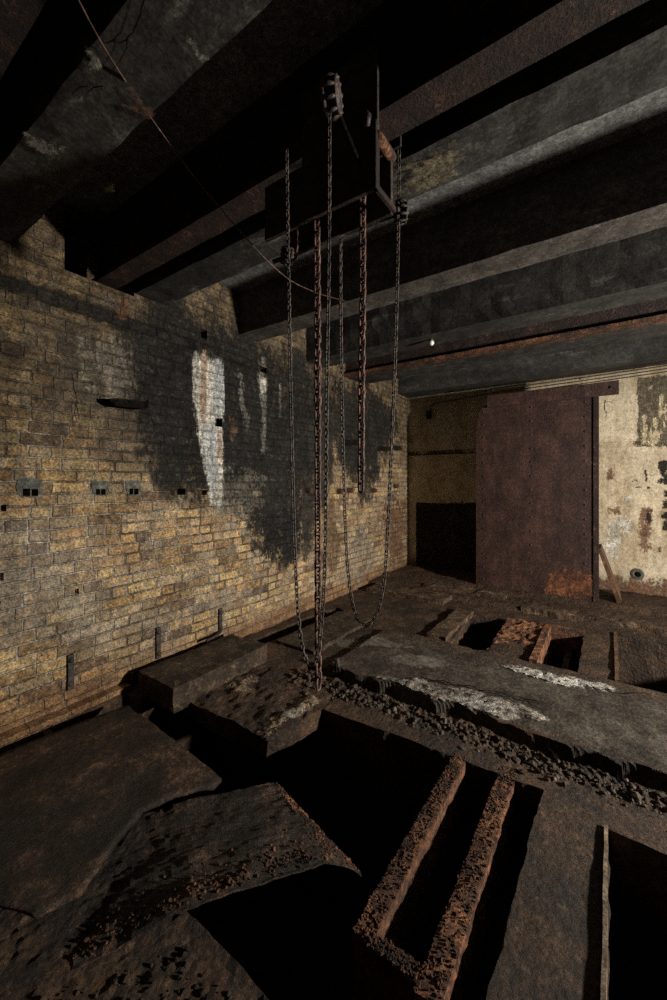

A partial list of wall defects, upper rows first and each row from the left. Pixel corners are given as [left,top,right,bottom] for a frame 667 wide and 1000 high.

water stain [192,350,225,509]
peeling [636,374,667,447]
corrosion [545,569,593,599]
crack [420,677,552,719]
water stain [502,665,615,691]